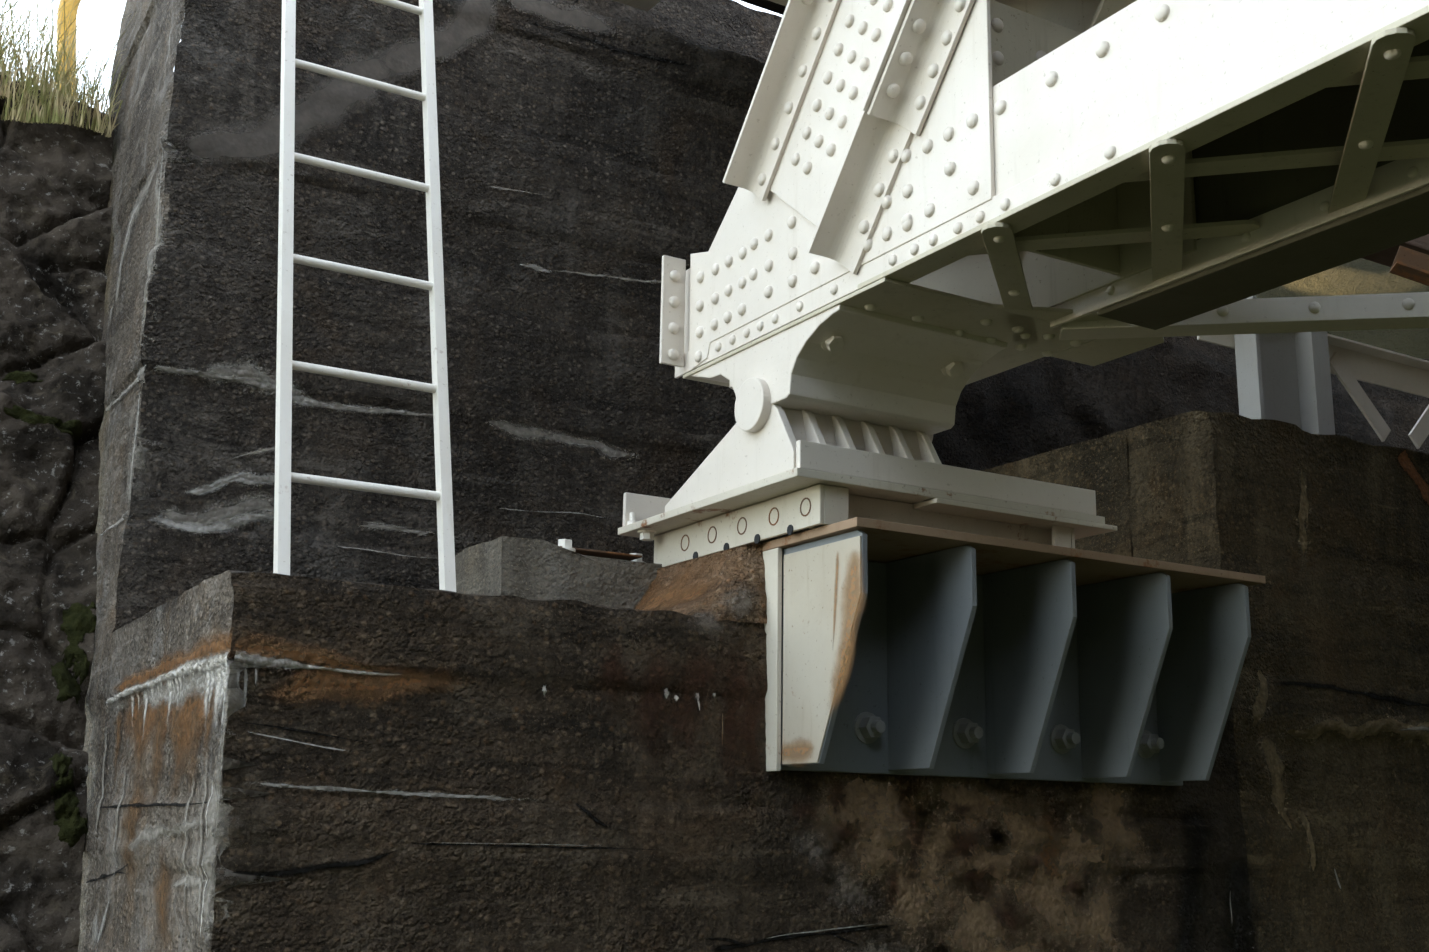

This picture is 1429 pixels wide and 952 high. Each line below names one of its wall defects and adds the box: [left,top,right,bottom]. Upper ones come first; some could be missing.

corrosion [116,636,446,780]
crack [1276,681,1429,707]
water stain [96,651,512,934]